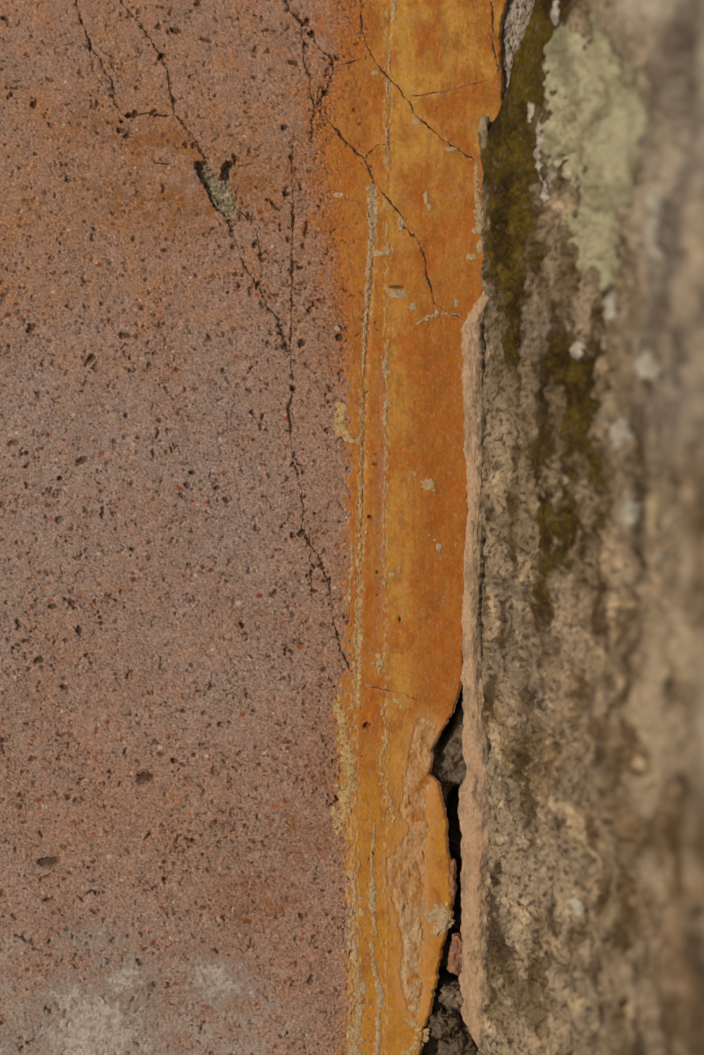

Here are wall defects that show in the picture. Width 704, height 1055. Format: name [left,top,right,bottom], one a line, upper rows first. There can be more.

crack [75,0,205,165]
spalling [500,0,535,99]
spalling [196,162,236,217]
crack [228,0,499,671]
peeling [342,685,478,1055]